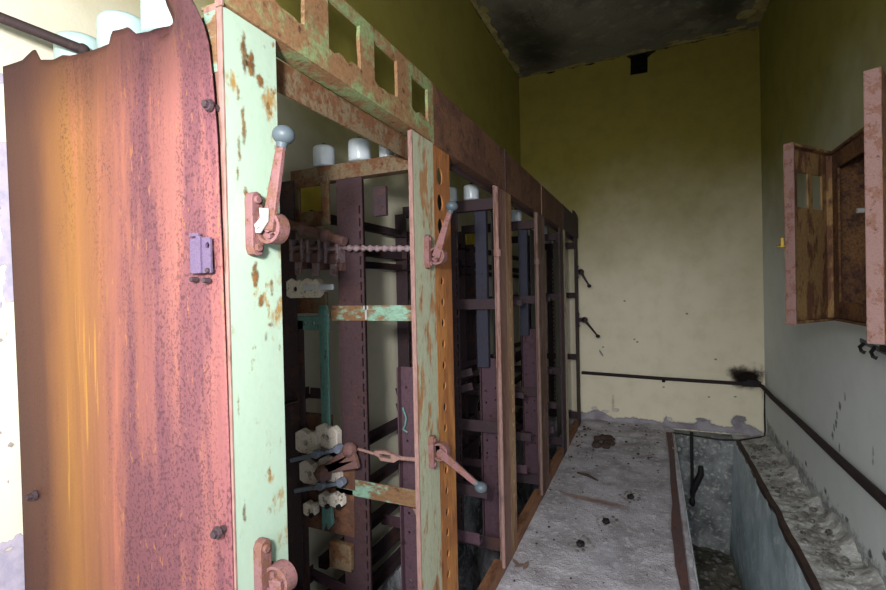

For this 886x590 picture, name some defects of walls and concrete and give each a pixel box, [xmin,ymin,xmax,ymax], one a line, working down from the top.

peeling [0,142,14,308]
peeling [0,533,25,590]